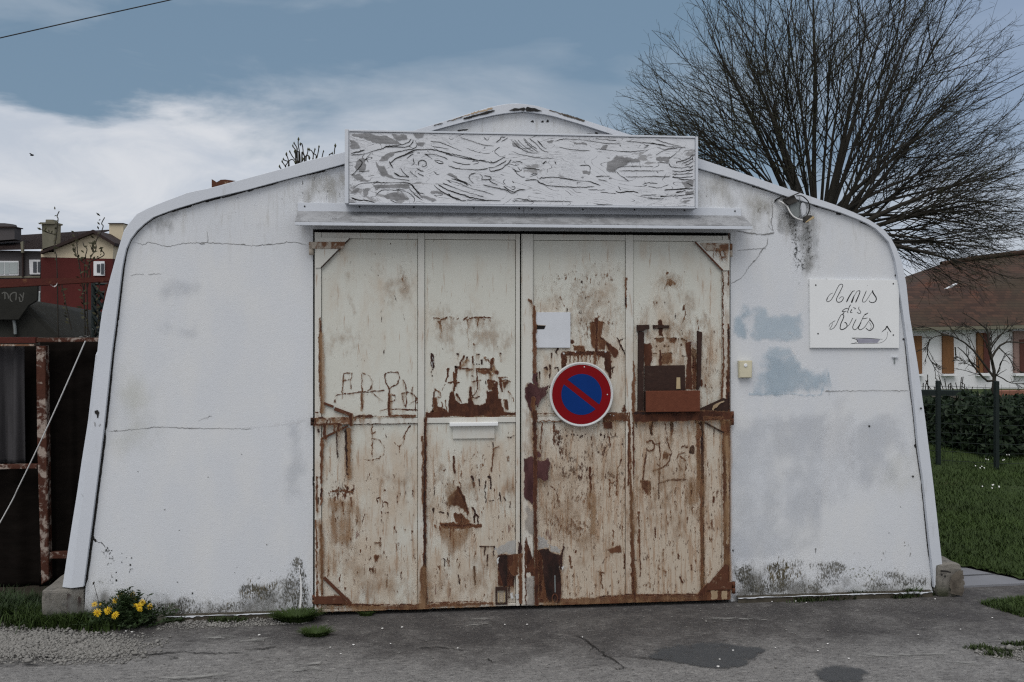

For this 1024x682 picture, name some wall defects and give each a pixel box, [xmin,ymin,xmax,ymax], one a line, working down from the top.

crack [82,165,344,585]
leakage [154,558,309,614]
corrosion [314,317,523,611]
corrosion [535,233,734,605]
leakage [779,211,813,269]
leakage [734,557,926,596]